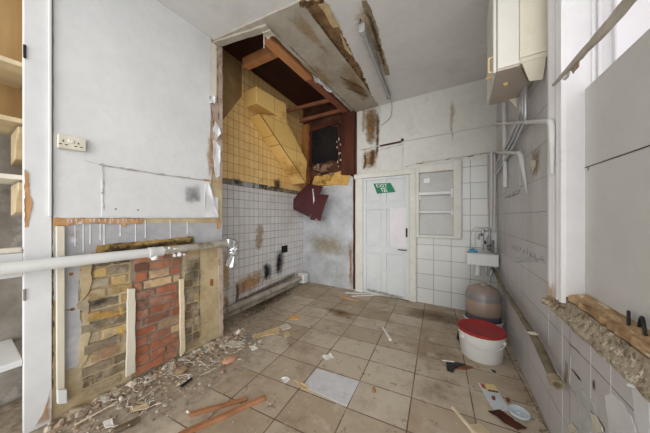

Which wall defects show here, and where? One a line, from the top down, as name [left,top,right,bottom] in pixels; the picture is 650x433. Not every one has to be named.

flaking render [299,0,371,94]
flaking render [361,0,390,75]
peeling [313,75,341,100]
flaking render [209,42,300,195]
flaking render [313,138,341,176]
peeling [24,170,33,227]
peeling [52,217,142,227]
peeling [204,182,220,229]
damp [264,254,283,278]
flaking render [69,250,200,400]
spalling [605,388,650,433]